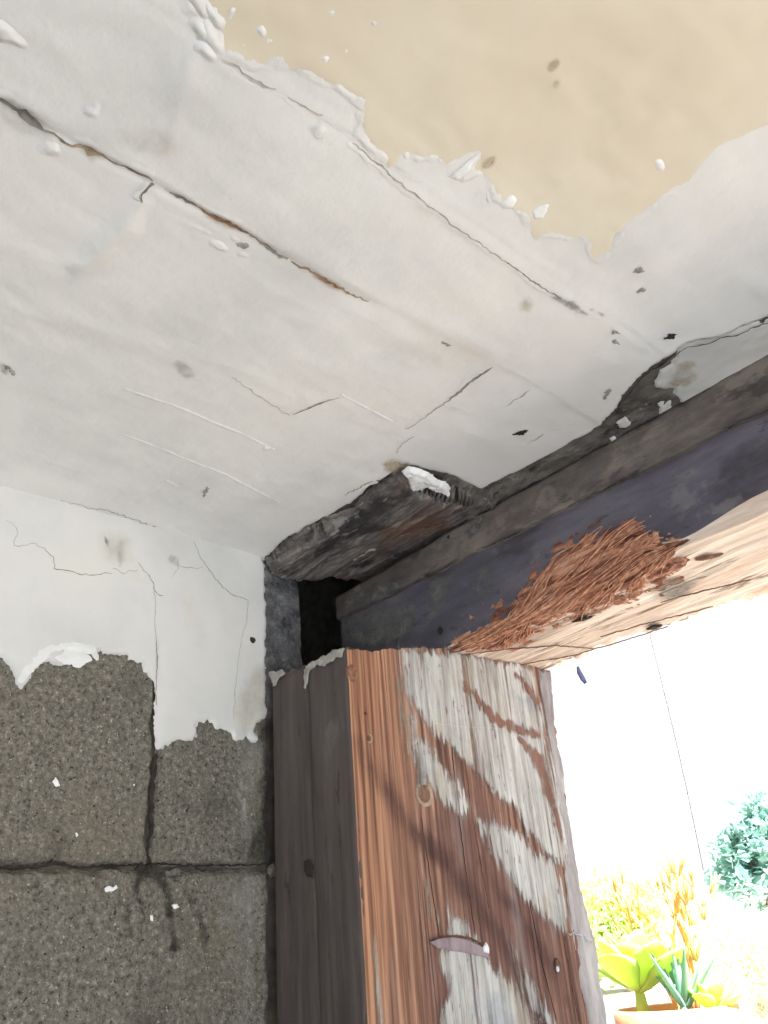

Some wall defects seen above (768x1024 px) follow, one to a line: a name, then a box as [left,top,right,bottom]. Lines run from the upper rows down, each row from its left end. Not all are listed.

crack [0,88,373,302]
crack [222,60,572,305]
peeling [209,0,768,265]
crack [232,377,337,415]
spalling [265,317,768,582]
crack [6,520,246,705]
crack [0,754,269,872]
flaking render [0,651,275,1024]
leakage [136,865,173,919]